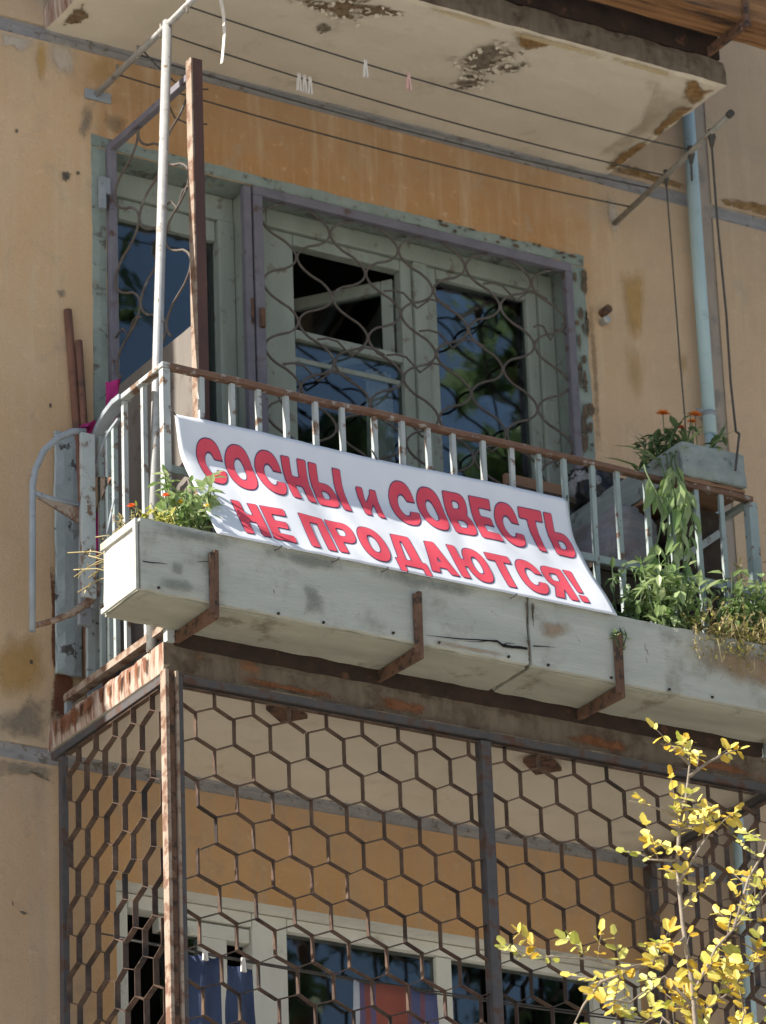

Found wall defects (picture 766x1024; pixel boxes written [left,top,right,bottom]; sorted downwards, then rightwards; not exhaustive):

peeling [289,0,404,35]
peeling [449,37,548,90]
rust [654,81,714,135]
rust [609,142,646,170]
peeling [573,268,588,294]
peeling [575,307,595,453]
rust [50,572,146,736]
crack [427,635,549,650]